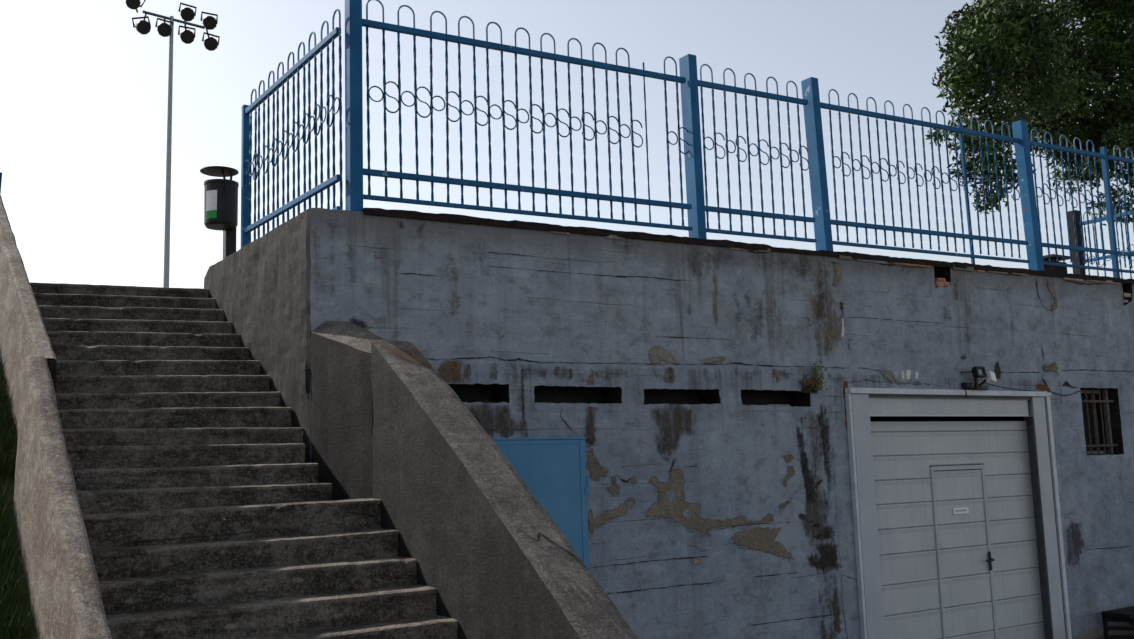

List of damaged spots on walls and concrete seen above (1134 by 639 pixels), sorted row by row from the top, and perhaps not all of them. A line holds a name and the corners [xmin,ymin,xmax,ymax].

spalling [832,255,1028,287]
water stain [467,366,598,438]
water stain [655,405,692,456]
peeling [585,447,796,562]
water stain [797,406,838,573]
crack [515,529,714,594]
water stain [821,588,841,639]